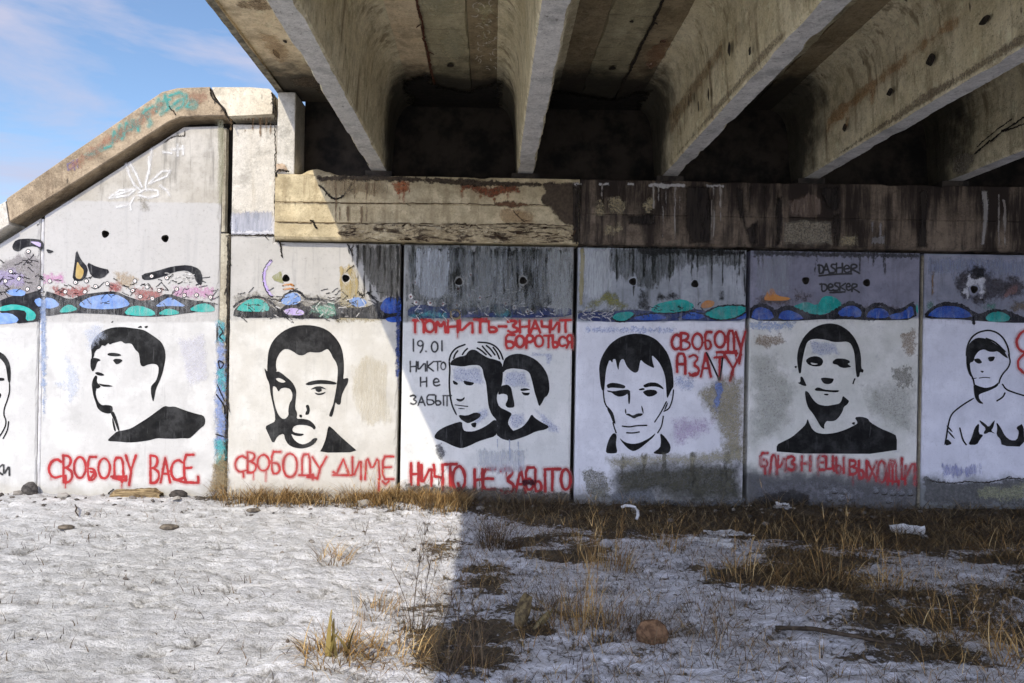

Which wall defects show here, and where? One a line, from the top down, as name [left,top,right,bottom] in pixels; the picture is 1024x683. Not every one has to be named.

crack [210,89,230,121]
crack [974,117,1024,155]
corrosion [392,181,410,201]
corrosion [460,185,528,208]
damp [316,174,1024,316]
damp [612,452,909,507]